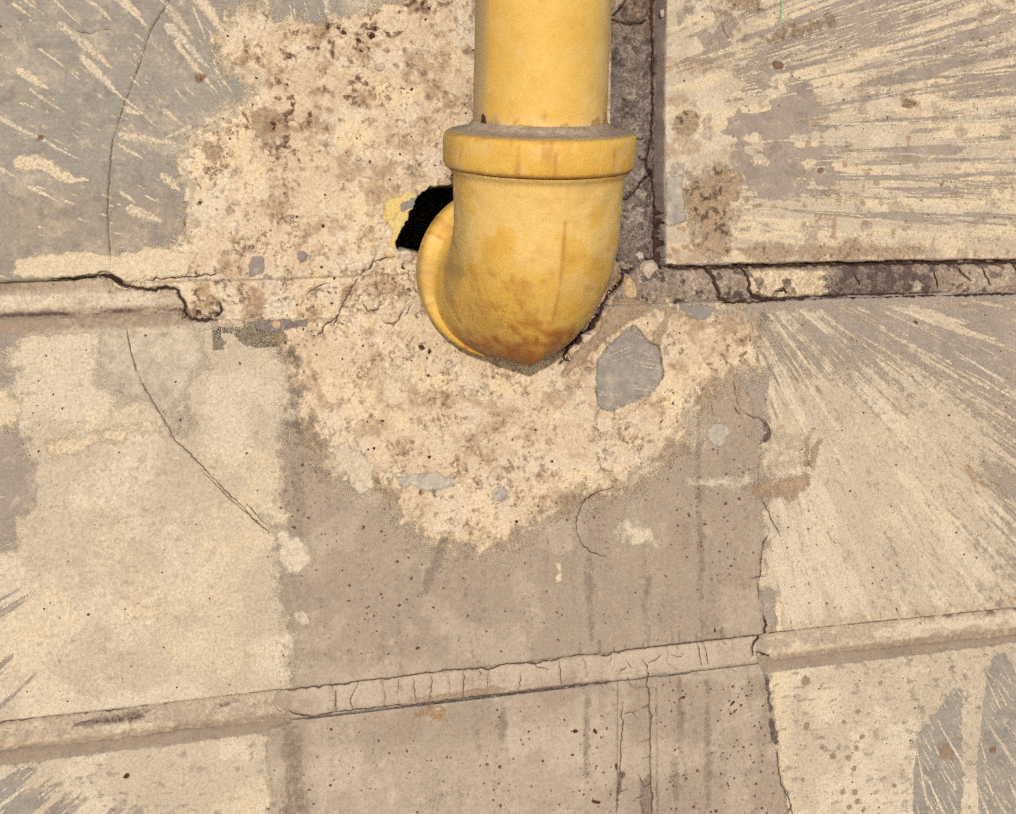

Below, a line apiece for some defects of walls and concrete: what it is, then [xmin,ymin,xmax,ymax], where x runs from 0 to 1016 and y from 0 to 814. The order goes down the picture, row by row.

spalling [326,24,377,52]
crack [56,0,223,322]
spalling [400,198,417,212]
spalling [665,175,687,226]
crack [559,0,1016,364]
spalling [248,257,264,277]
spalling [251,319,307,332]
crack [307,256,412,338]
spalling [635,251,658,279]
spalling [596,325,664,411]
crack [575,487,613,557]
crack [0,503,918,814]